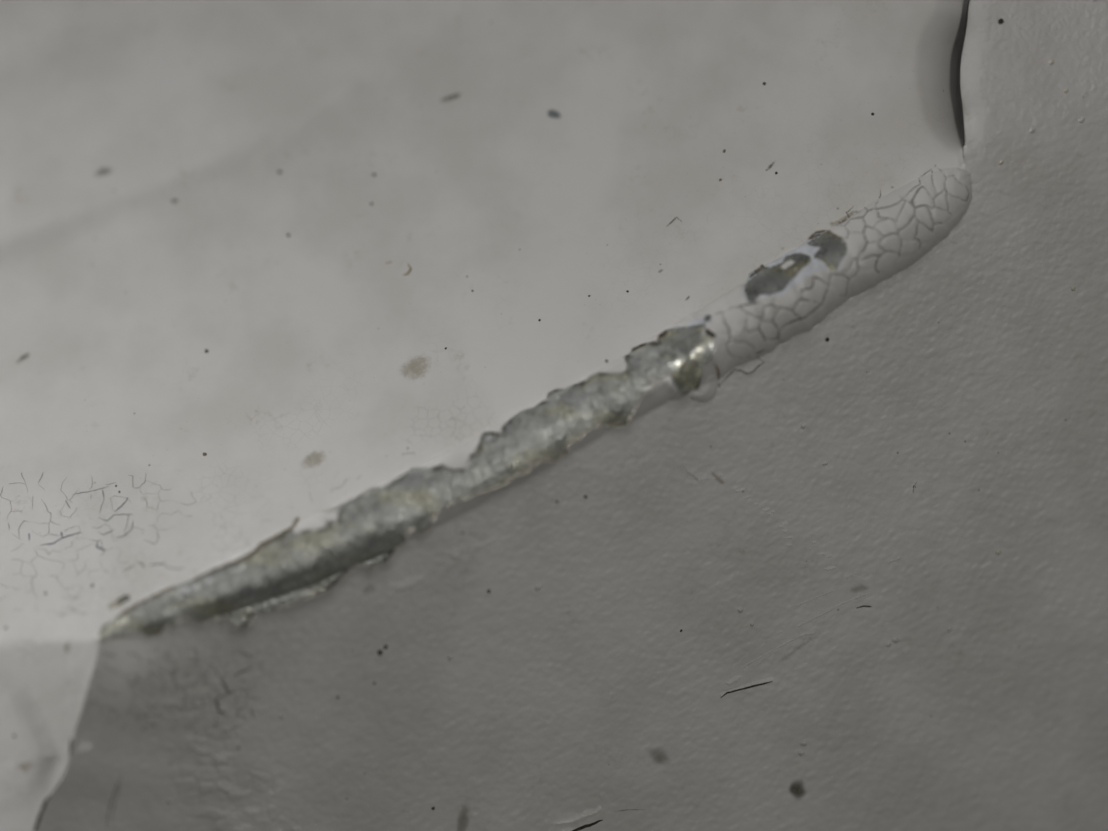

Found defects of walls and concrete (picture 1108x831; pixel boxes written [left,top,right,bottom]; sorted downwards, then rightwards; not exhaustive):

crack [715,166,969,359]
crack [0,473,196,617]